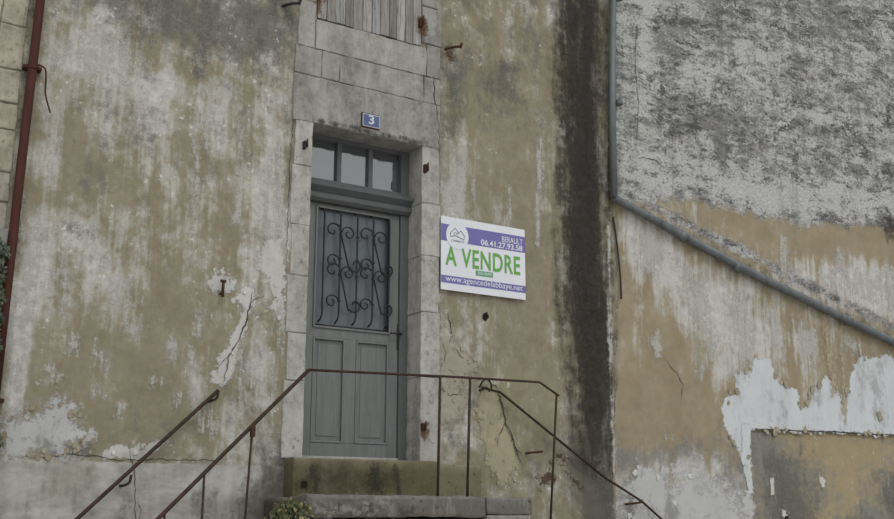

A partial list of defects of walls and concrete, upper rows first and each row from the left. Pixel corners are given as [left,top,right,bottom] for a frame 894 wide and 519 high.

damp [440,51,477,219]
damp [533,136,544,247]
damp [552,0,757,519]
peeling [166,302,213,377]
crack [216,295,264,384]
peeling [0,393,164,466]
peeling [721,322,894,497]
damp [764,456,817,519]